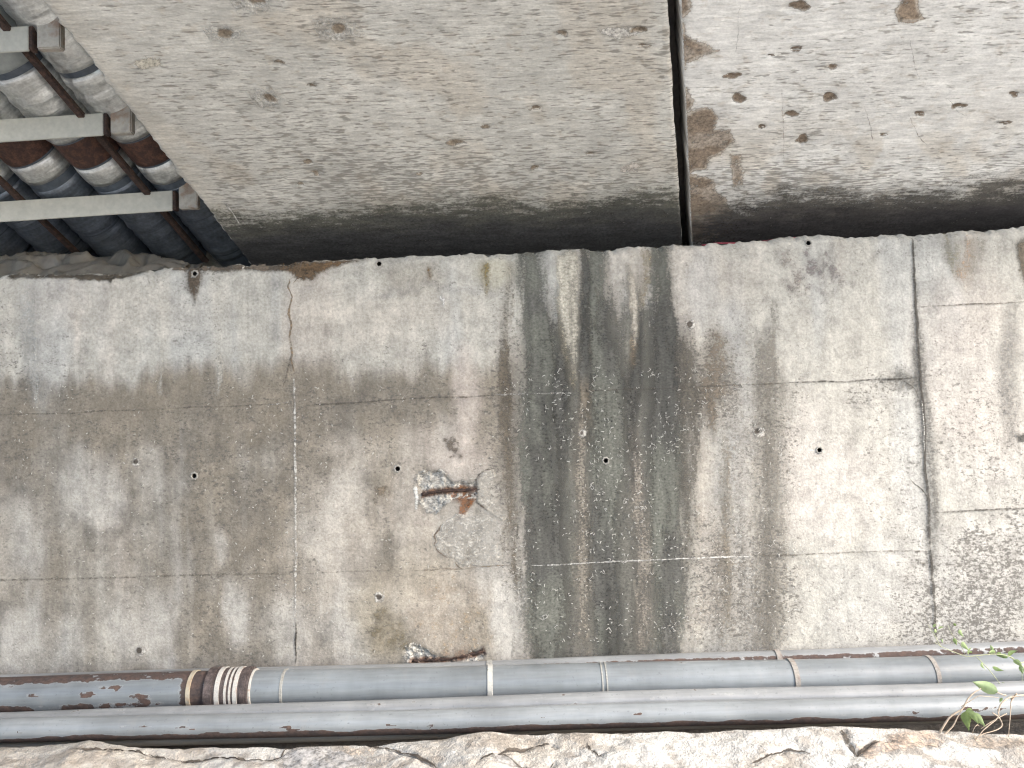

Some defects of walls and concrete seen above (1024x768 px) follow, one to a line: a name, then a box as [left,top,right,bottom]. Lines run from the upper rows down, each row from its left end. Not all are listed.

crack [283,274,305,385]
leakage [172,175,1024,659]
spalling [416,365,849,644]
crack [789,239,937,638]
spalling [403,642,486,663]